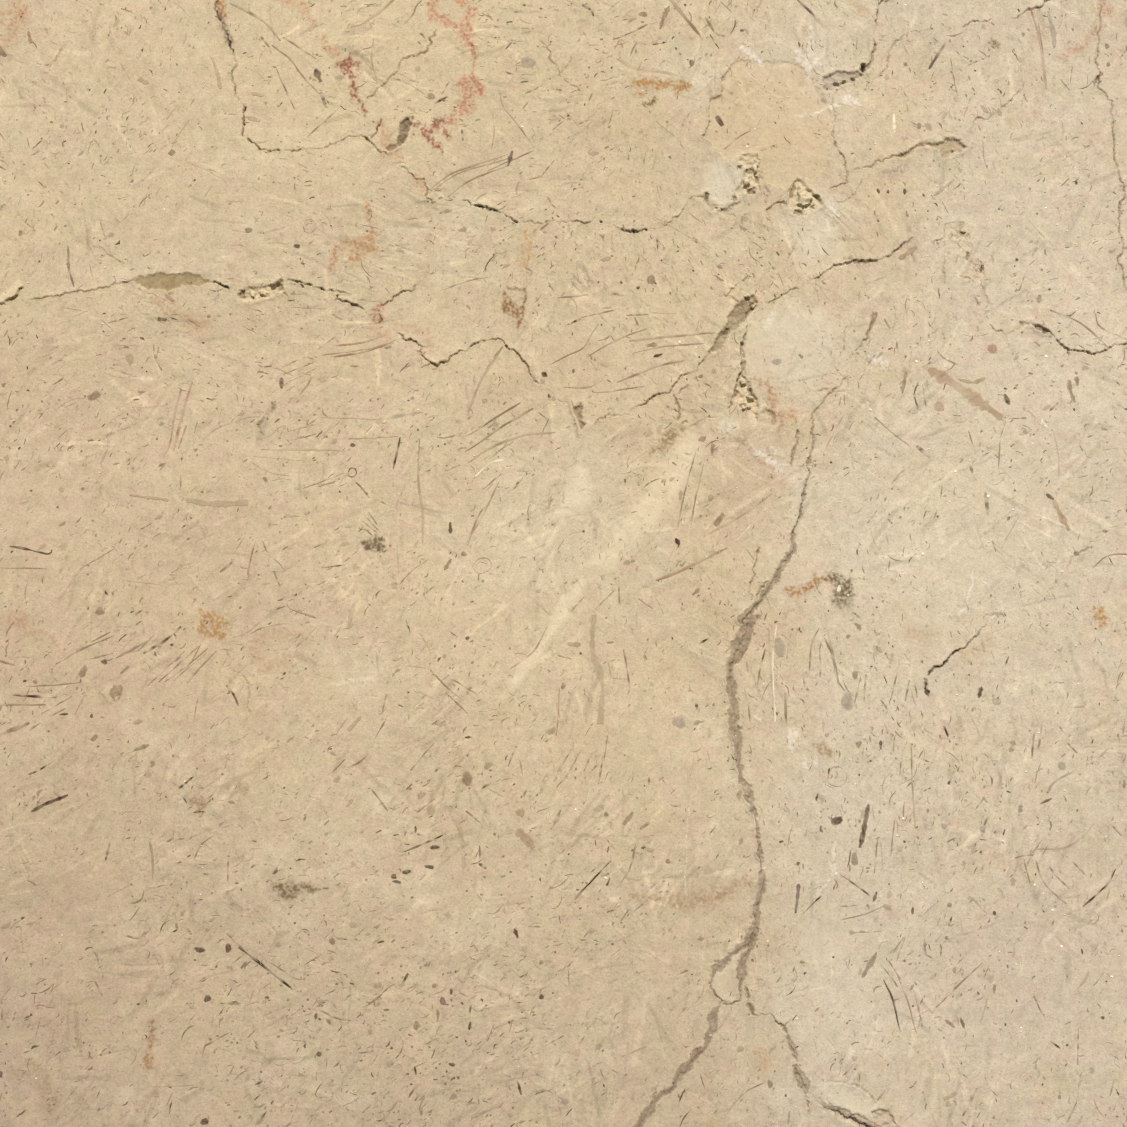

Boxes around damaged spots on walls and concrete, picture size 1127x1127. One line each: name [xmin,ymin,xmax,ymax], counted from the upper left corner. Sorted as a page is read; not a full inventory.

crack [24,277,137,303]
peeling [135,272,211,293]
spalling [236,278,285,304]
rust [410,0,491,156]
crack [210,0,697,310]
crack [282,220,1127,431]
crack [765,200,786,212]
peeling [696,58,865,217]
crack [827,0,1053,204]
crack [1091,0,1127,304]
crack [631,309,891,1127]
crack [922,621,989,699]